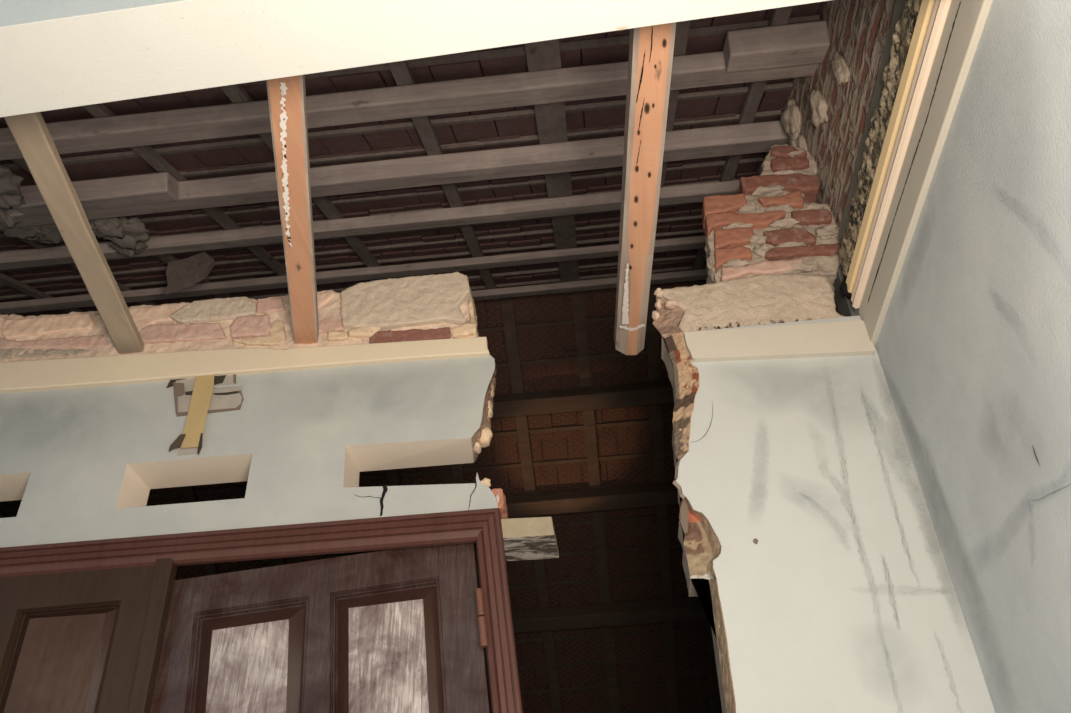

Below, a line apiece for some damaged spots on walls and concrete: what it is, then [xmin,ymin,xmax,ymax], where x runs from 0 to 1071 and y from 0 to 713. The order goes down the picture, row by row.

spalling [166,374,244,456]
spalling [472,364,497,463]
spalling [652,288,721,580]
crack [354,485,388,516]